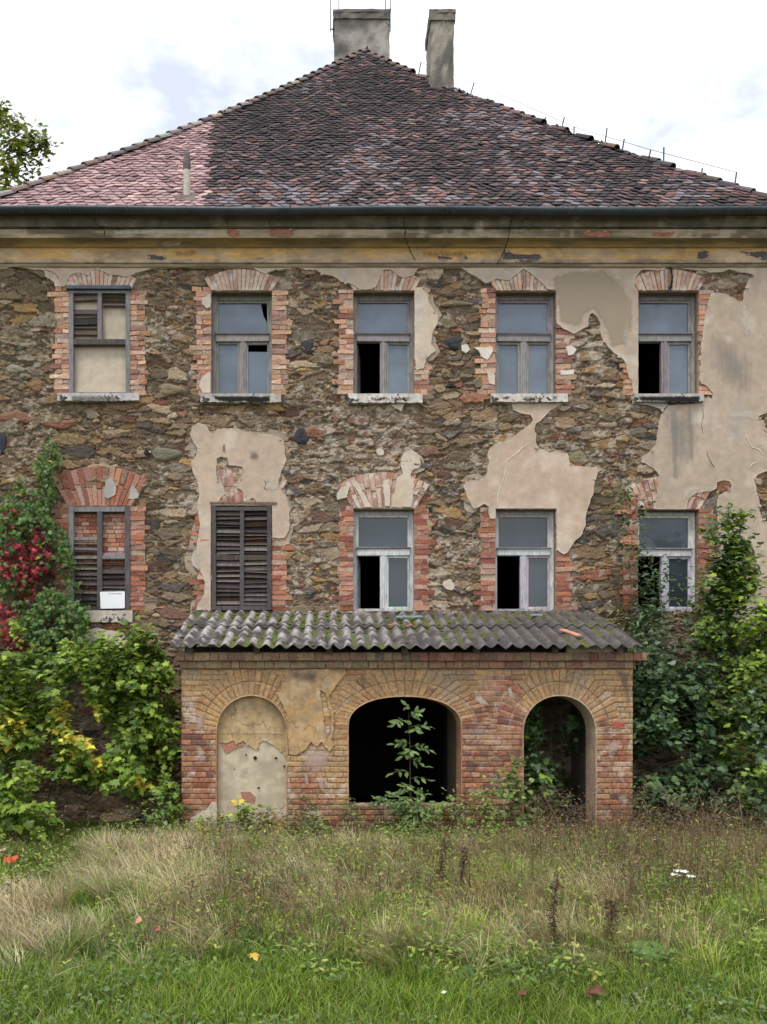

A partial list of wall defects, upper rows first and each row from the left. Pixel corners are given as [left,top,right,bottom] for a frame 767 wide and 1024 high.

spalling [0,241,767,821]